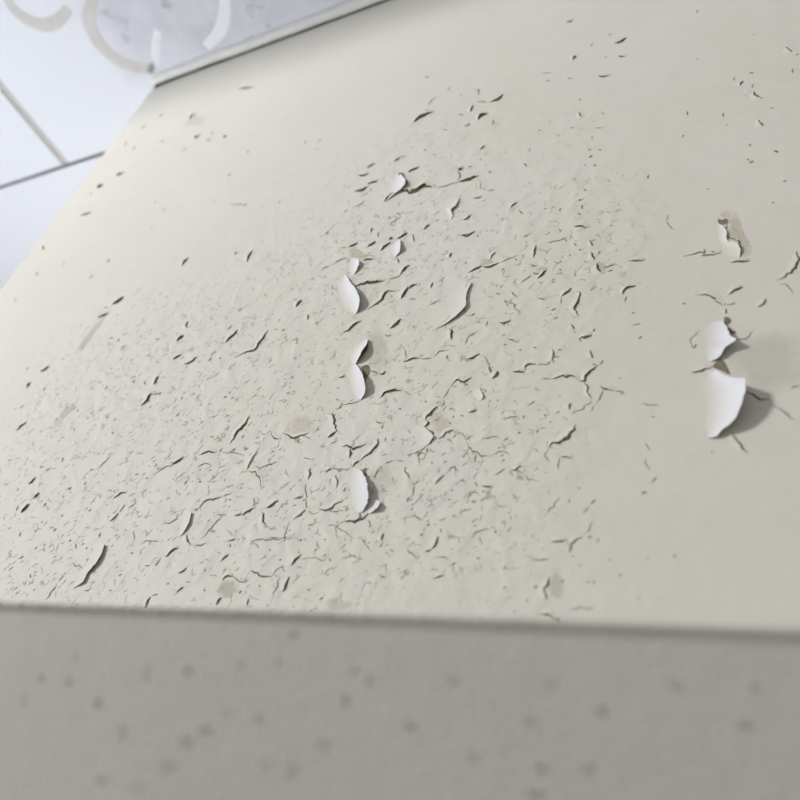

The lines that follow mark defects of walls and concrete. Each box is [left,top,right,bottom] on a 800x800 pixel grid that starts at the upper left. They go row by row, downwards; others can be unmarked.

peeling [386,175,424,201]
peeling [718,224,741,259]
peeling [338,250,369,314]
peeling [348,338,368,400]
peeling [703,320,746,438]
crack [133,216,645,606]
peeling [349,468,380,514]